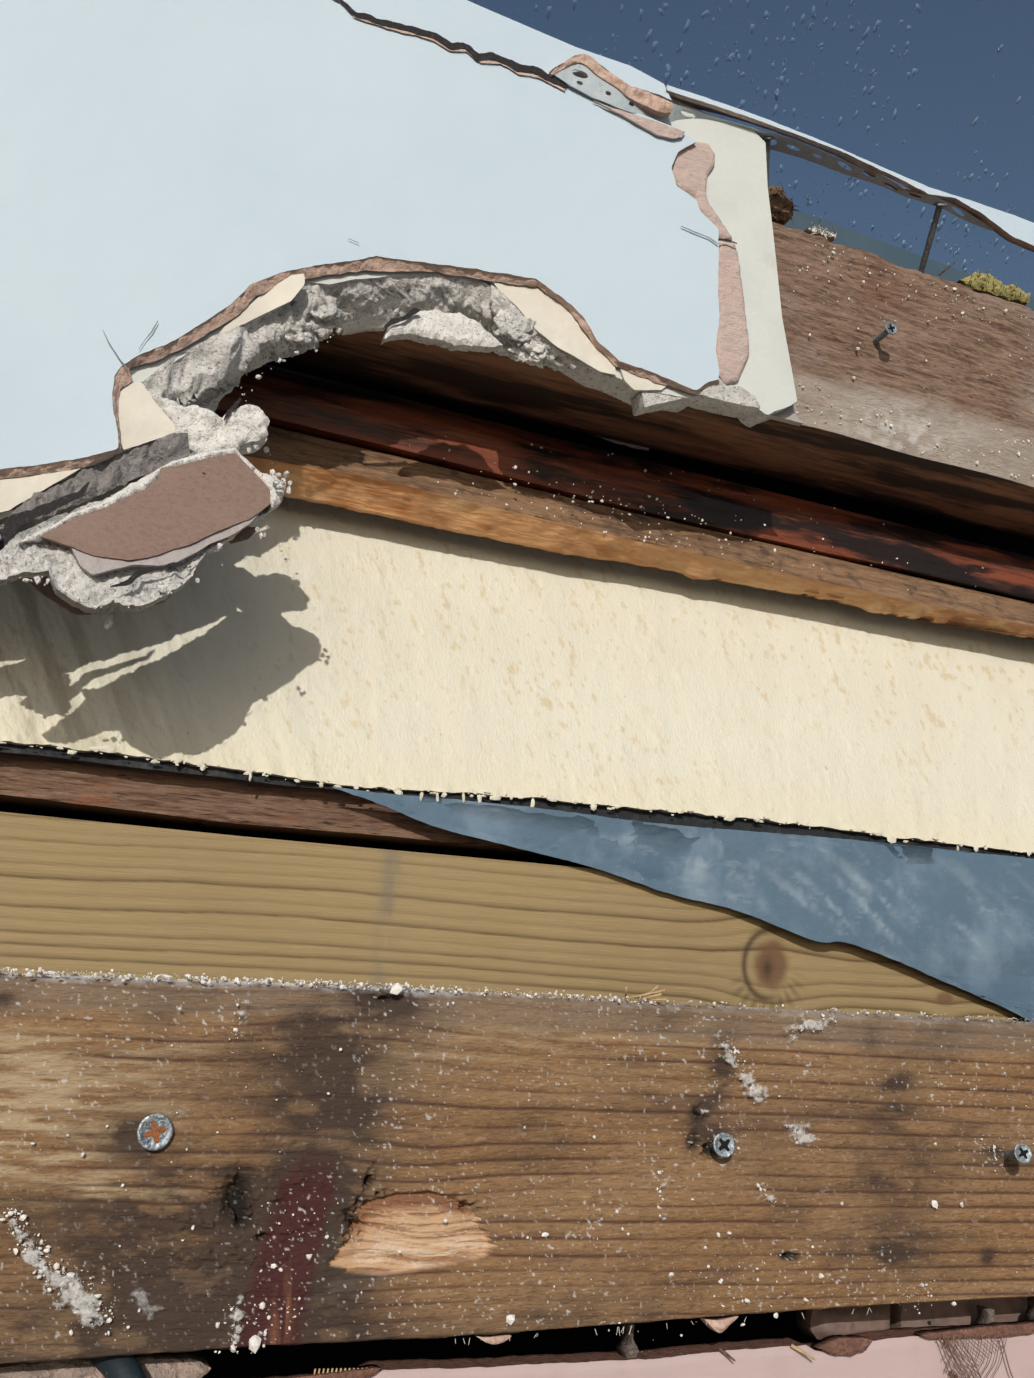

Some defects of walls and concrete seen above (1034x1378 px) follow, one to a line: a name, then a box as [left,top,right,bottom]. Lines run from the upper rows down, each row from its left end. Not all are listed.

crack [337,0,567,91]
flaking render [942,199,1034,252]
flaking render [0,54,922,513]